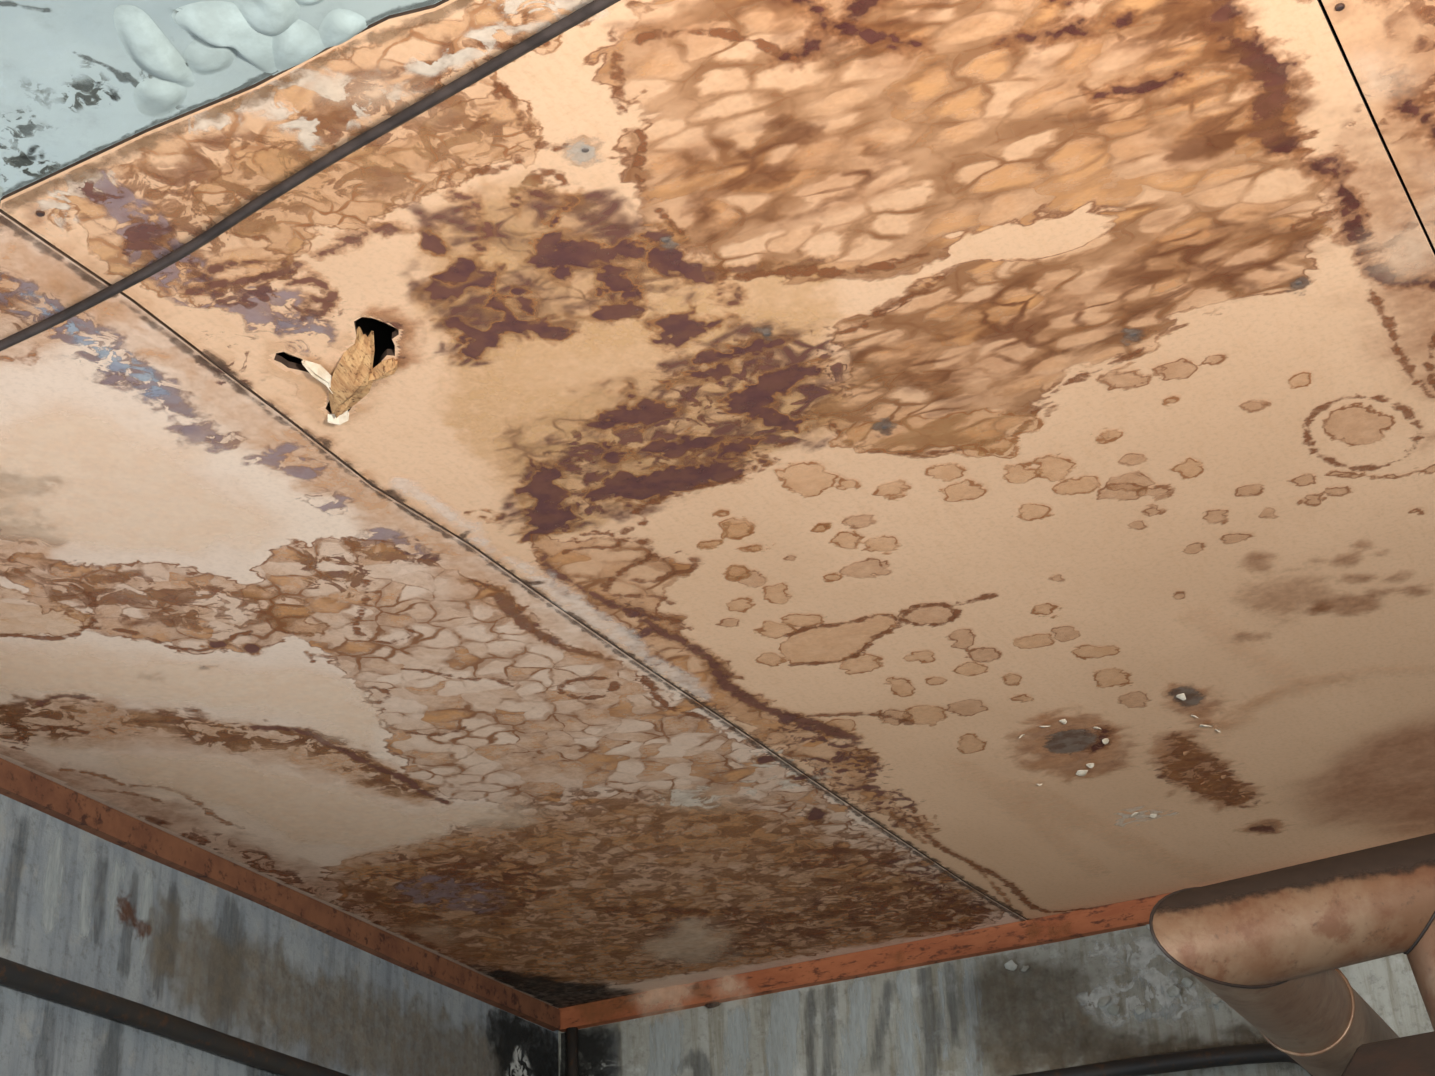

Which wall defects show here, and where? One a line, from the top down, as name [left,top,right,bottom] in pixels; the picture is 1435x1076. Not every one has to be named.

crack [0,1,50,12]
flaking render [63,80,119,109]
leakage [584,26,687,111]
flaking render [0,110,57,177]
leakage [48,0,532,278]
leakage [141,71,578,367]
leakage [1290,395,1435,506]
leakage [0,508,464,680]
leakage [754,594,998,675]
peeling [661,787,719,808]
peeling [743,749,832,793]
peeling [806,807,828,823]